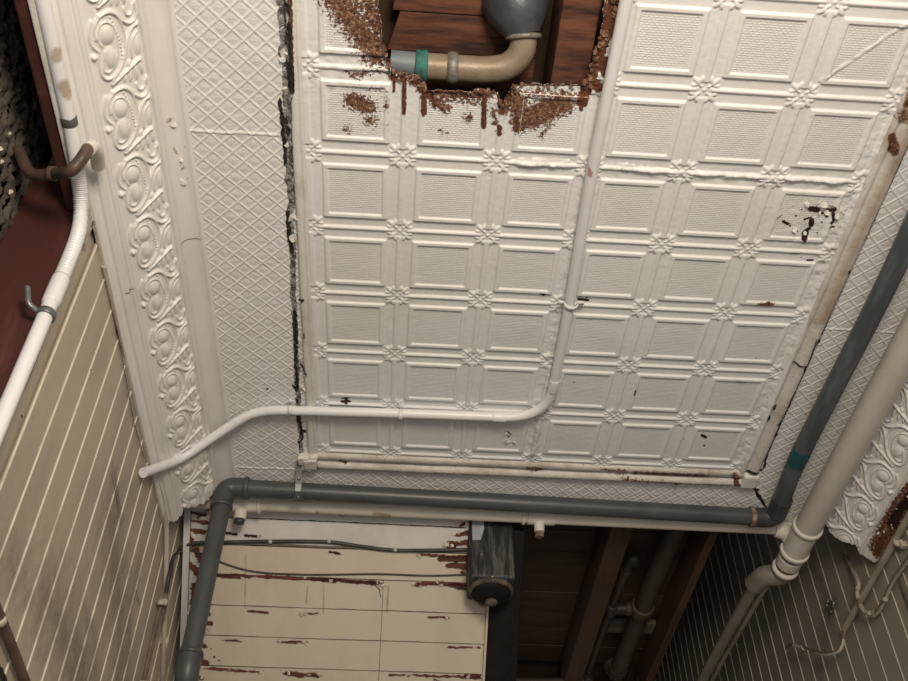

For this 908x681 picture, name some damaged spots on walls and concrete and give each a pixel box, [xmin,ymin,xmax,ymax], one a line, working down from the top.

corrosion [317,0,619,140]
corrosion [894,81,908,124]
corrosion [887,133,903,177]
crack [276,0,318,469]
crack [745,274,850,508]
corrosion [868,481,908,559]
peeling [187,509,211,615]
peeling [217,573,387,588]
peeling [412,521,470,590]
peeling [199,644,260,680]
peeling [388,673,483,681]